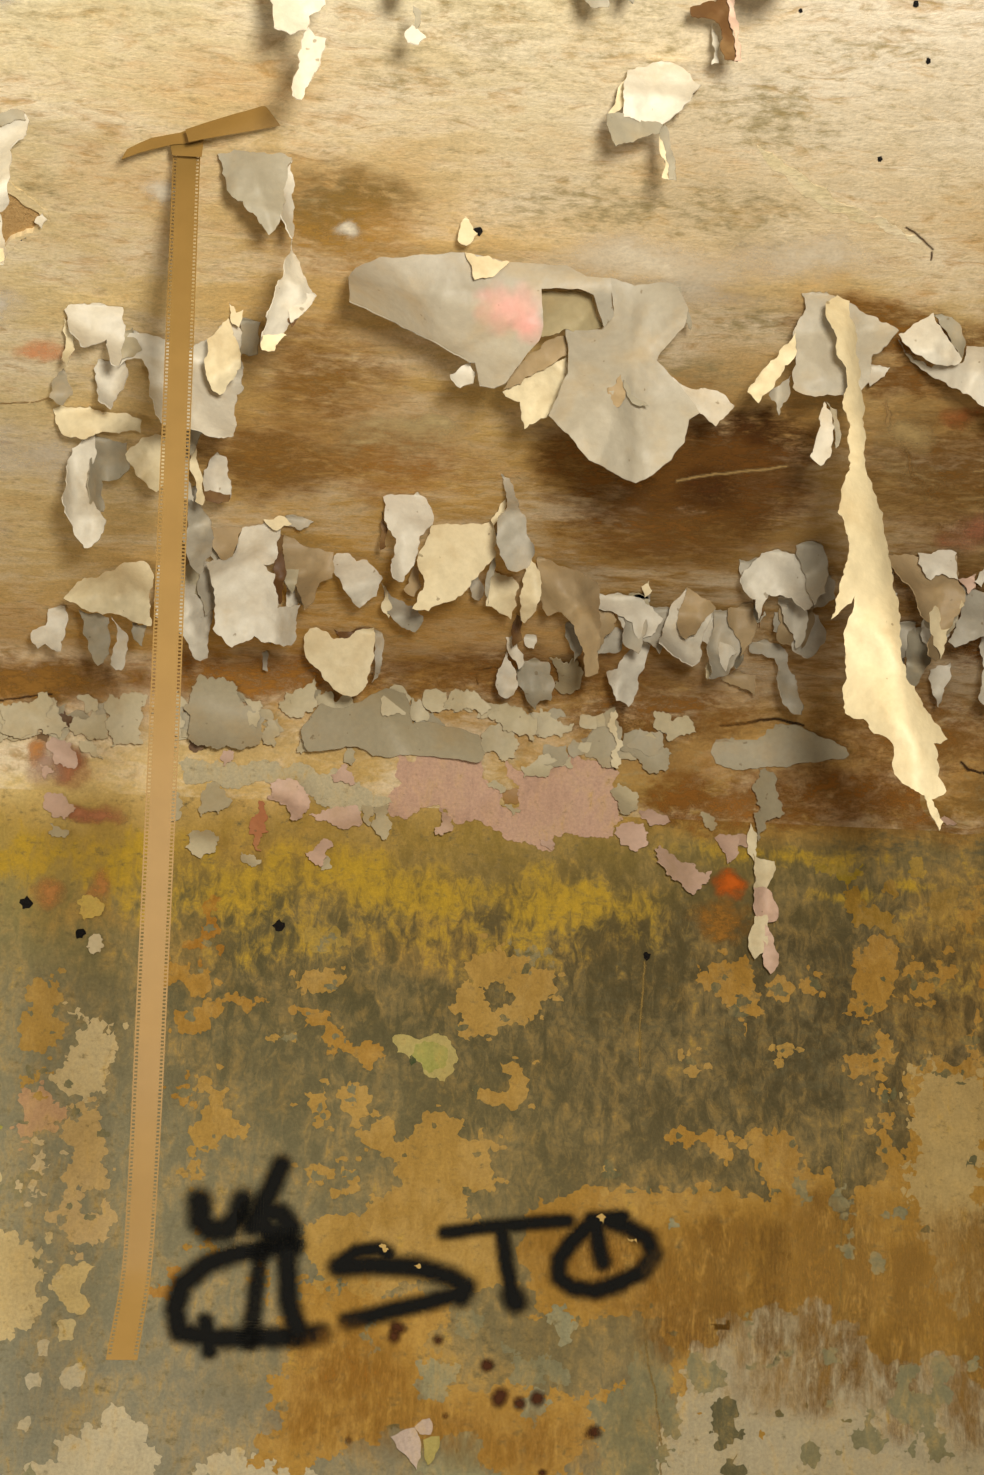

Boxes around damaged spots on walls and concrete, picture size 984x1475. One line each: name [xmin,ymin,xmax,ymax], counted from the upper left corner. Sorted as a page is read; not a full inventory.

peeling [270,0,327,100]
crack [906,227,934,261]
damp [845,295,984,397]
peeling [49,303,169,548]
damp [535,412,816,560]
peeling [31,561,160,670]
peeling [164,149,984,1041]
damp [177,654,327,699]
damp [390,650,747,736]
damp [923,703,984,758]
flaking render [0,967,129,1390]
flaking render [192,884,984,1475]